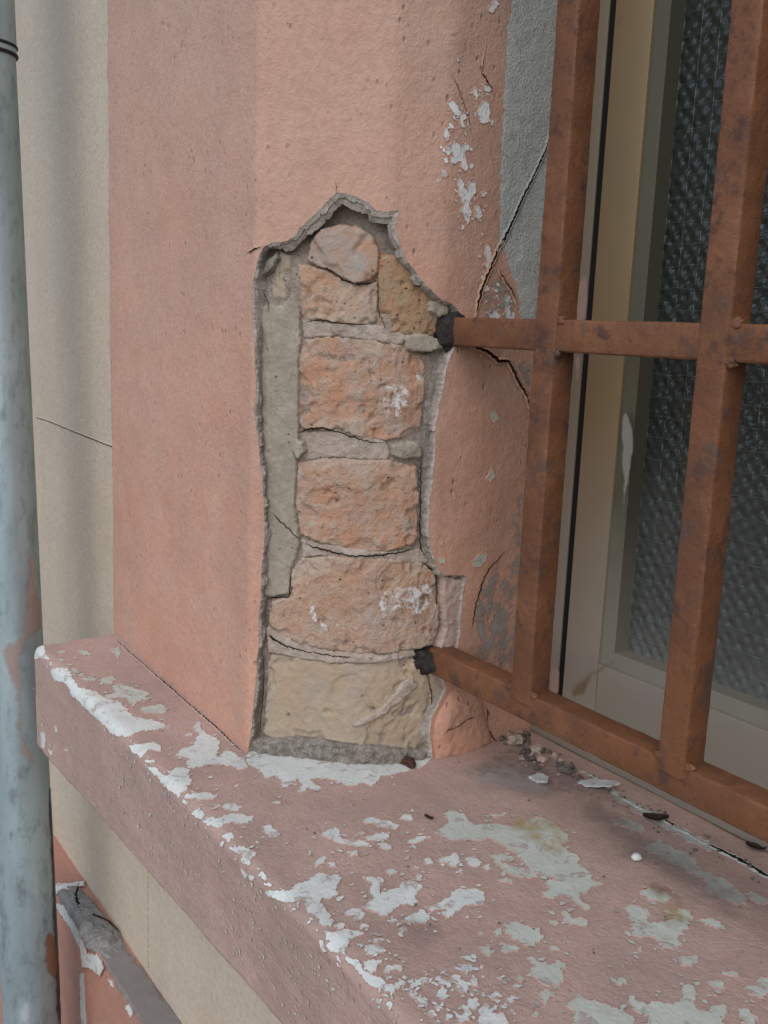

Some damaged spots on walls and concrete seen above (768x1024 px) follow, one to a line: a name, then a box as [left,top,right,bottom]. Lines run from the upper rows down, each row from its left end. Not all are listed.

flaking render [437,0,558,319]
crack [474,134,549,318]
crack [469,347,530,410]
spalling [34,192,605,1024]
crack [472,554,502,627]
crack [579,770,768,879]
peeling [607,789,768,906]
peeling [561,885,768,1024]